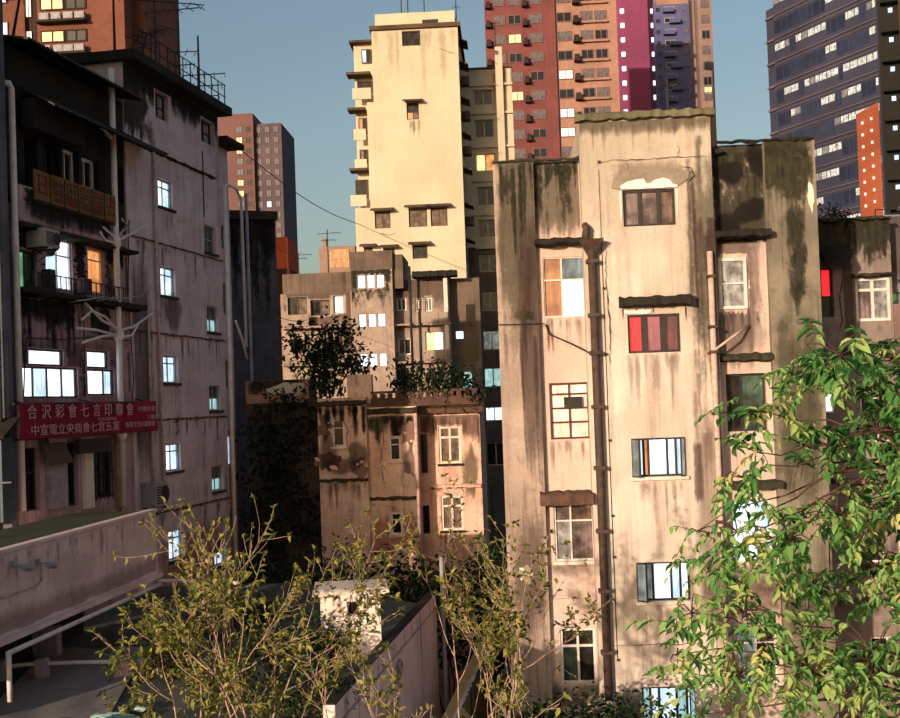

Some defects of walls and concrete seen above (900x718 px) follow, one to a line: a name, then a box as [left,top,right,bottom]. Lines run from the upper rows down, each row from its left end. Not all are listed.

water stain [19,228,46,281]
water stain [13,240,123,393]
water stain [24,188,113,238]
water stain [498,161,580,451]
peeling [612,168,689,222]
water stain [685,140,812,369]
crack [837,275,845,336]
water stain [818,216,900,344]
peeling [314,410,388,478]
water stain [317,406,479,495]